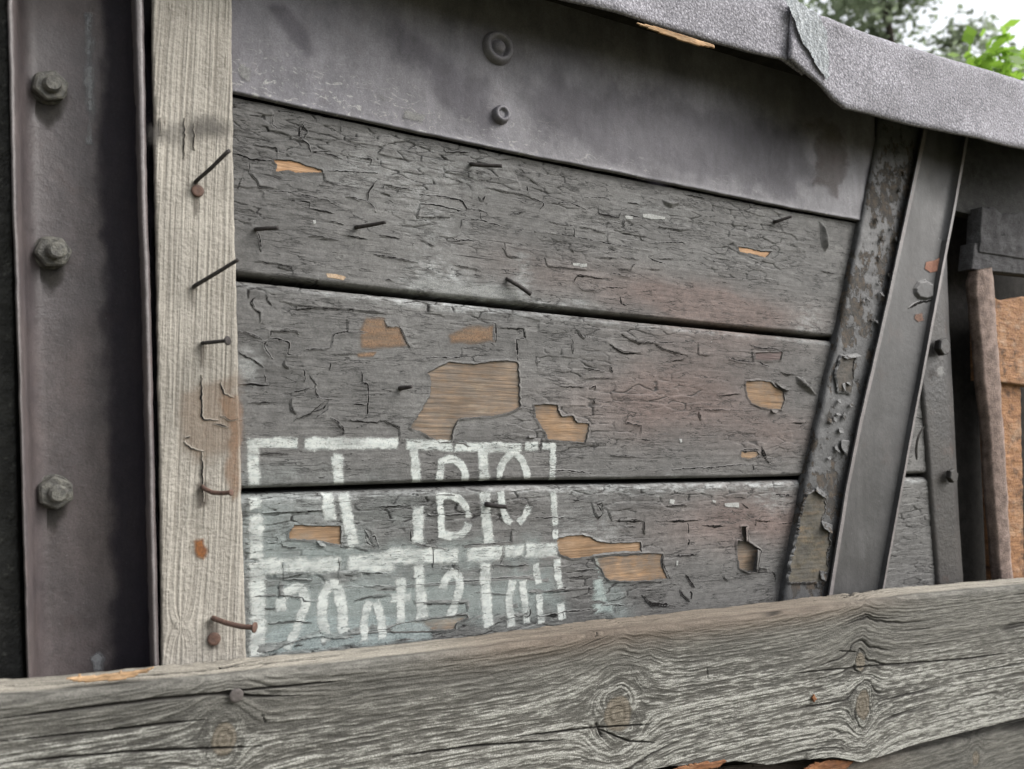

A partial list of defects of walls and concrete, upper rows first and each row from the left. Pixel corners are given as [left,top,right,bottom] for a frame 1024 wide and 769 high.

peeling [271,157,325,176]
crack [232,120,719,306]
crack [183,295,463,502]
peeling [408,358,591,445]
crack [495,323,541,367]
crack [560,330,795,404]
peeling [744,378,792,413]
corrosion [194,539,207,559]
crack [252,509,324,653]
peeling [286,522,344,548]
crack [337,499,726,618]
peeling [554,532,669,584]